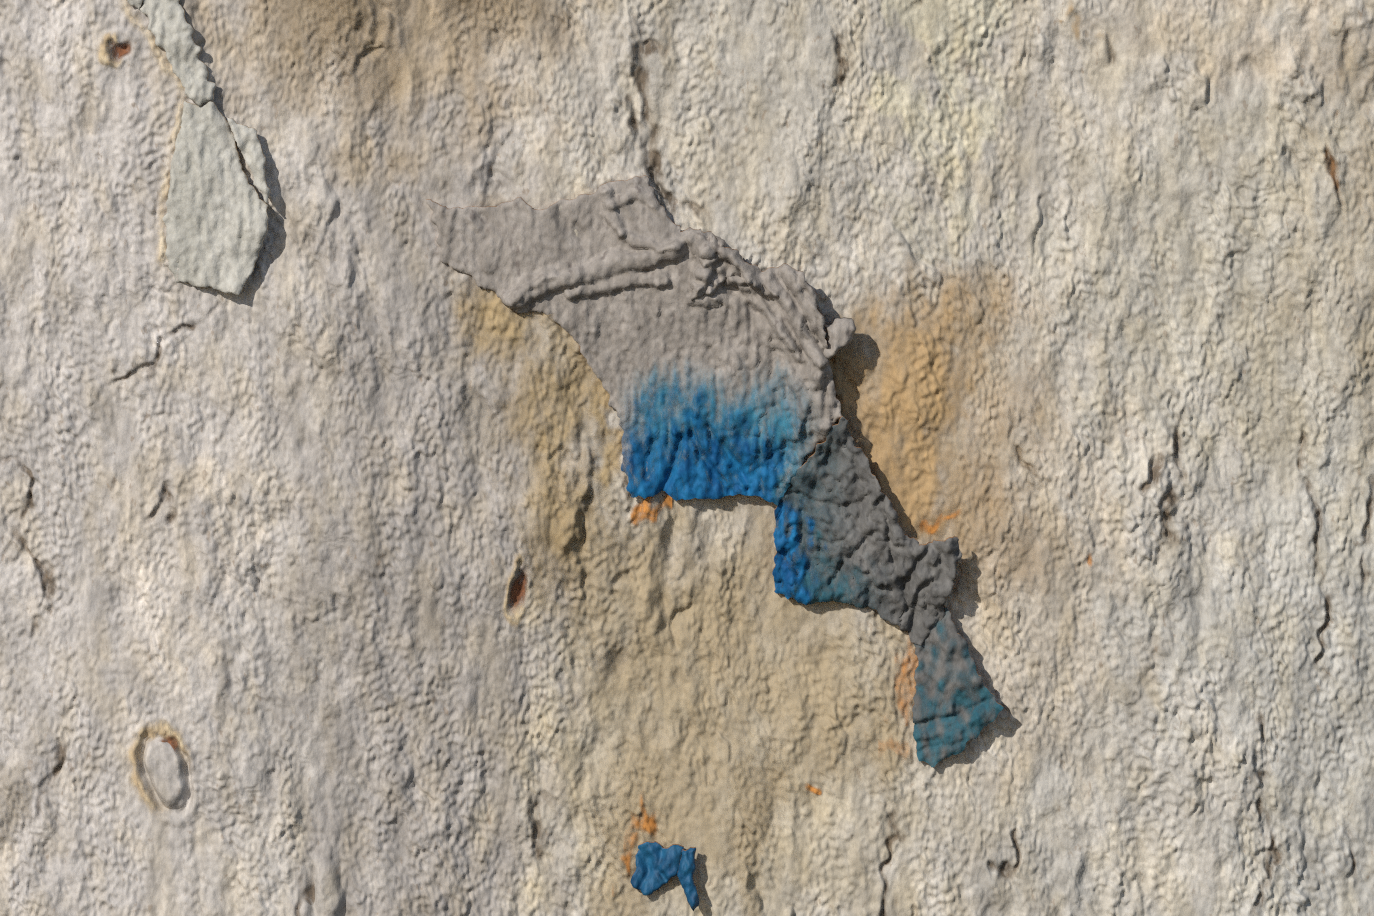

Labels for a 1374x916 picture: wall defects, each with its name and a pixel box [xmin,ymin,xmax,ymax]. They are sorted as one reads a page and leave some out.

peeling [630,841,700,912]